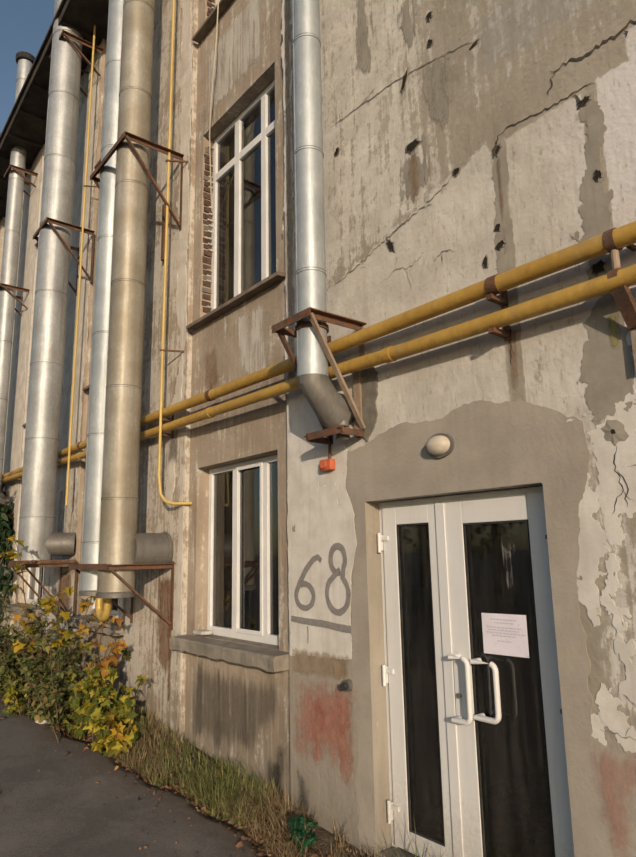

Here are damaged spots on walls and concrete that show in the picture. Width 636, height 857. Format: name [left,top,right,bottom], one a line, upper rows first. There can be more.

flaking render [393,0,433,48]
crack [330,42,469,128]
crack [492,20,636,158]
flaking render [571,90,614,242]
crack [340,177,451,281]
flaking render [586,253,612,280]
flaking render [567,293,636,753]
crack [612,446,636,514]